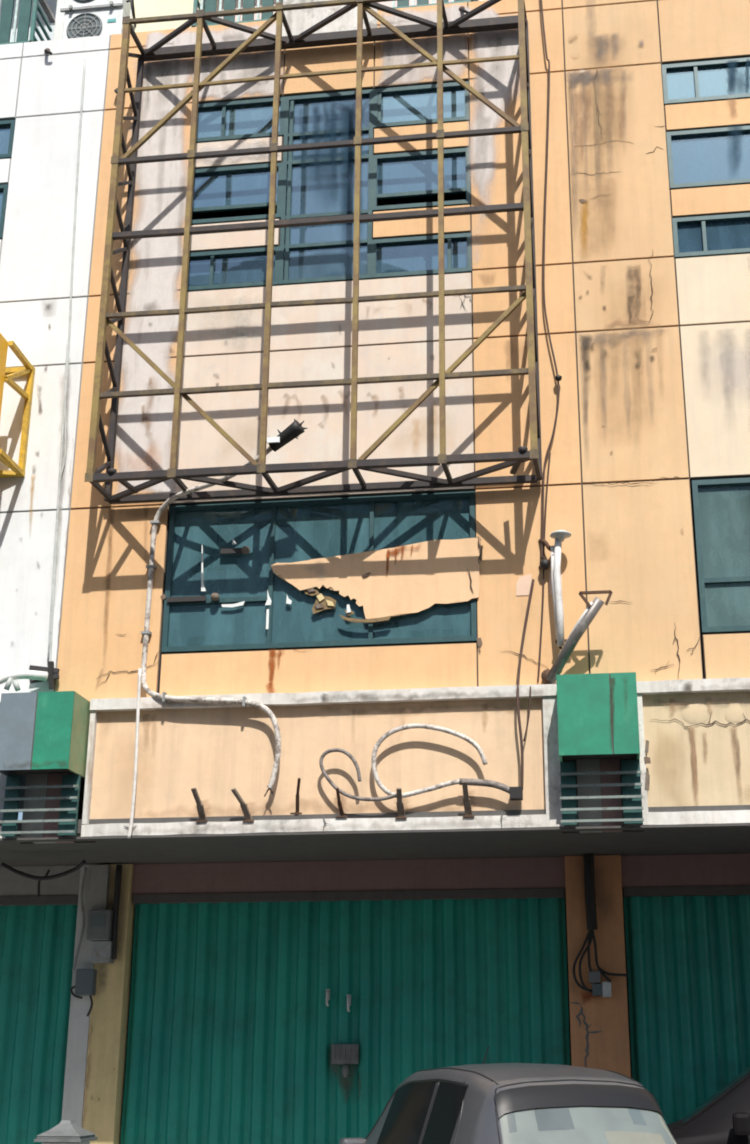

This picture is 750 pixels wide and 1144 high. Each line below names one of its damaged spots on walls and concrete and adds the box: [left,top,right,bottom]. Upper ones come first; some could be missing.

leakage [314,105,352,210]
peeling [271,536,483,623]
rust [386,545,413,573]
rust [269,650,281,692]
crack [654,623,700,679]
crack [652,711,750,734]
crack [569,1002,602,1068]